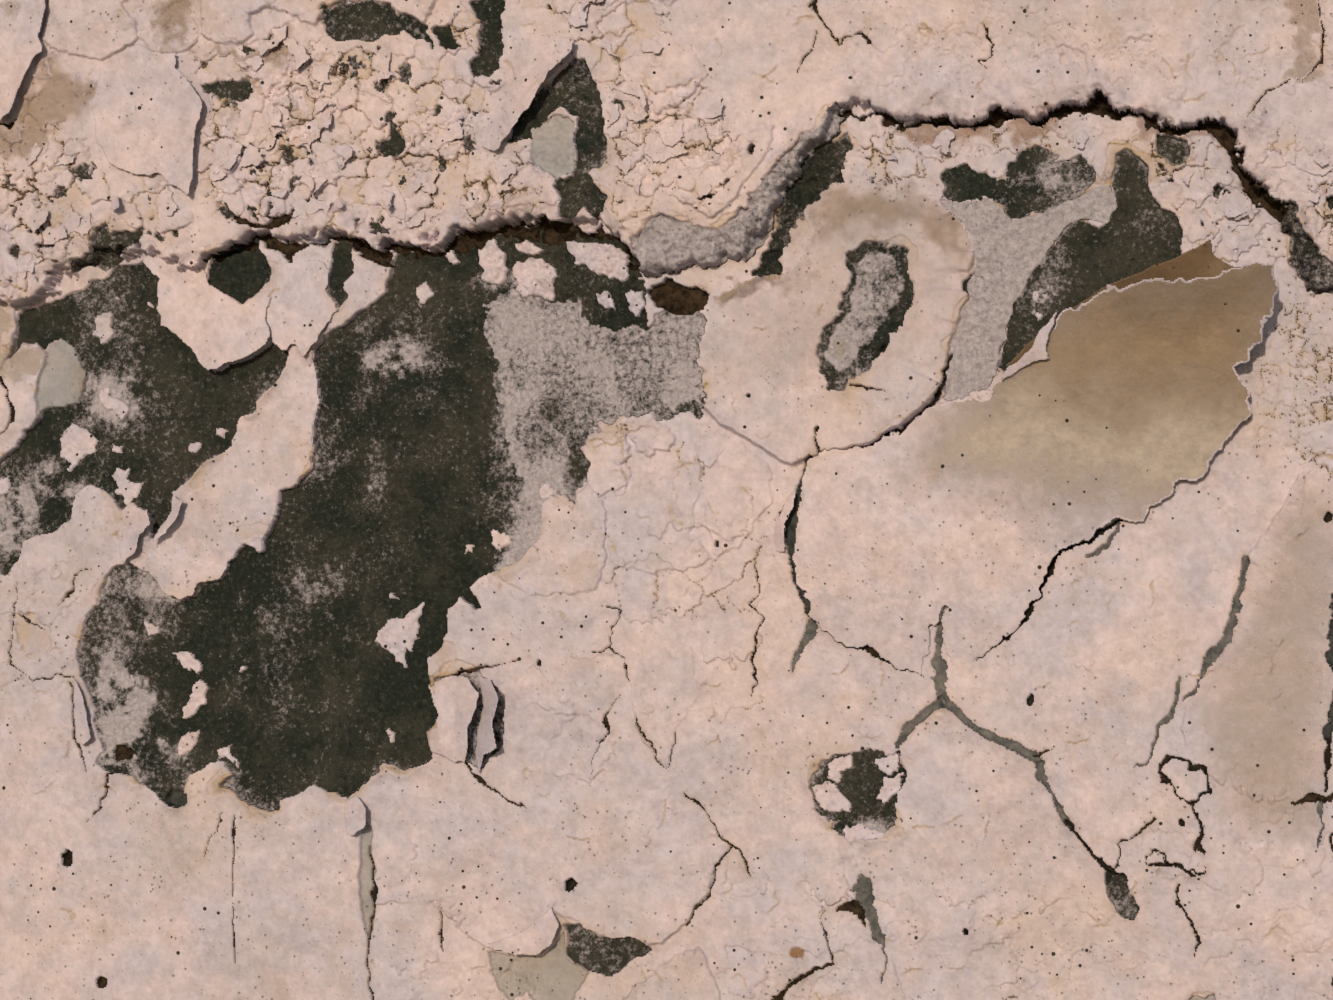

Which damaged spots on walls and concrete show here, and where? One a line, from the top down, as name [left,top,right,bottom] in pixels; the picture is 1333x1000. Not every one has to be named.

crack [201,195,646,277]
peeling [0,0,853,812]
crack [863,354,953,448]
peeling [792,119,1333,675]
crack [1245,294,1333,504]
crack [779,426,1250,957]
peeling [810,749,907,842]
crack [1291,702,1333,852]
peeling [343,796,376,937]
peeling [483,908,652,1000]
crack [772,874,888,1000]
peeling [1296,973,1333,1000]